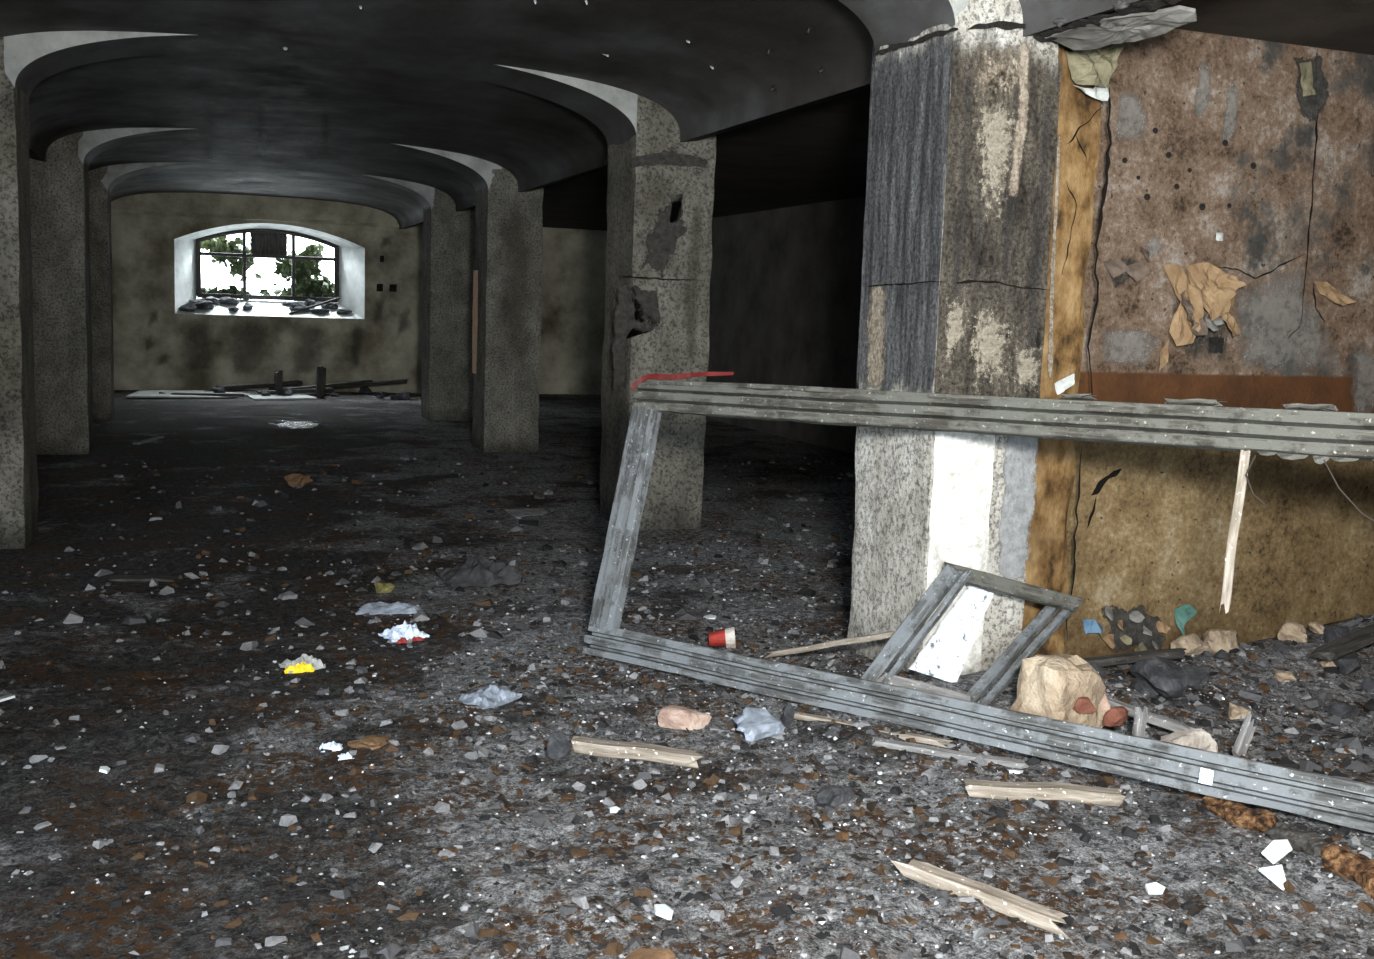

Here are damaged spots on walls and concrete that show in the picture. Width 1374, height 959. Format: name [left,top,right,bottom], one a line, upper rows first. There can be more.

flaking render [874,0,1185,218]
flaking render [1294,53,1330,122]
flaking render [612,194,687,392]
crack [866,81,1112,401]
flaking render [942,136,1075,395]
crack [1066,449,1122,637]